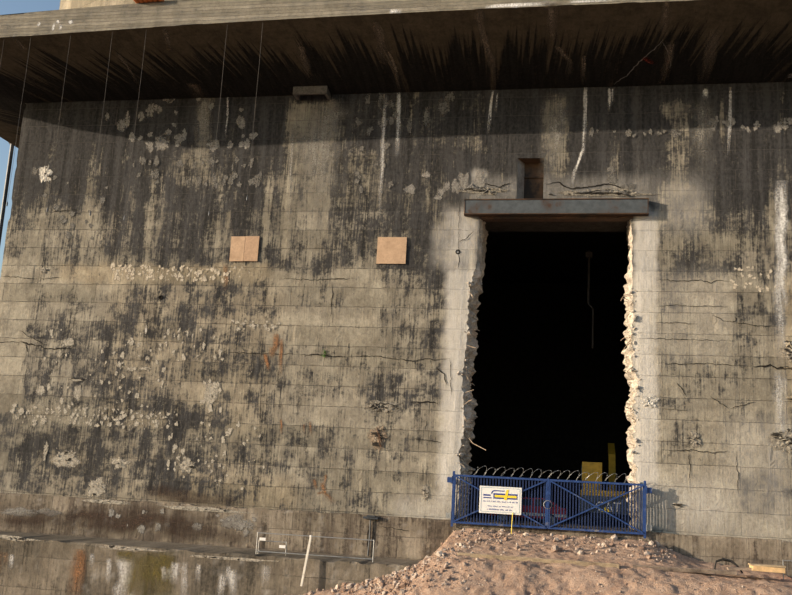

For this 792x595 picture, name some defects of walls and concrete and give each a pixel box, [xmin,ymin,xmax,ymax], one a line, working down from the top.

peeling [709,115,761,133]
peeling [774,117,792,133]
peeling [105,99,187,184]
peeling [176,108,262,189]
damp [776,188,787,302]
peeling [110,262,231,283]
crack [639,304,771,341]
crack [0,331,70,352]
crack [657,359,792,370]
peeling [10,325,240,486]
spalling [770,429,792,453]